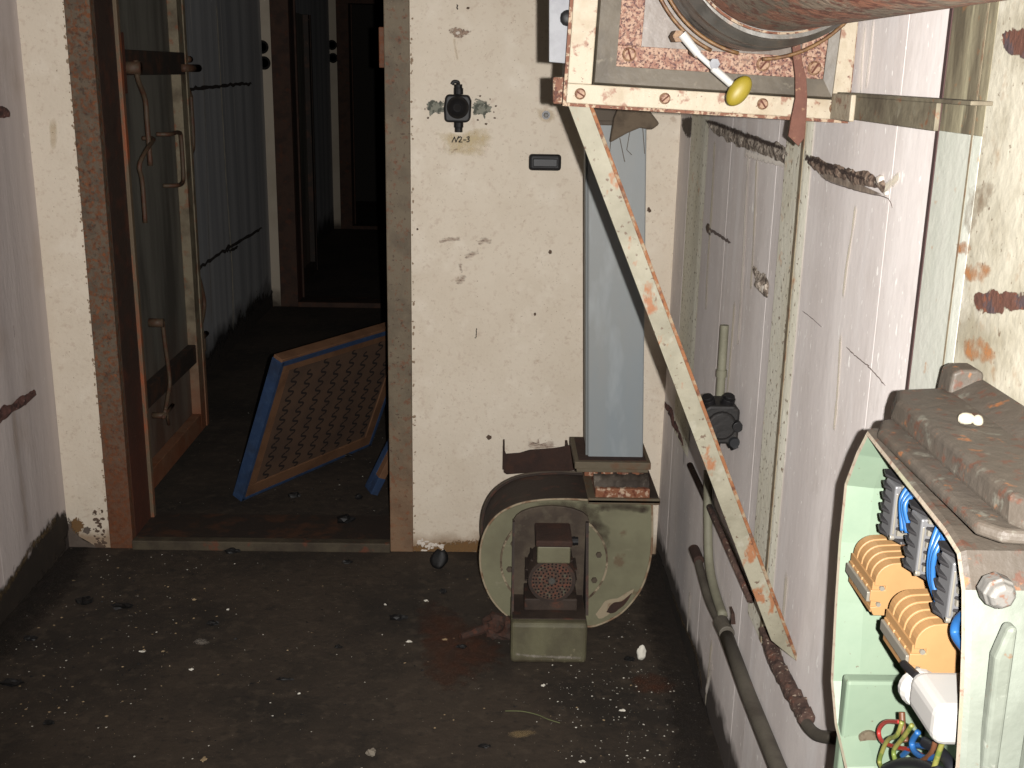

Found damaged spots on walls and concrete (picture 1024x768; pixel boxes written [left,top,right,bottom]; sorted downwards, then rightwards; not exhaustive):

rust [1002,28,1024,59]
crack [190,82,252,91]
crack [200,227,262,270]
rust [974,289,1024,314]
peeling [67,496,108,548]
water stain [0,511,85,624]